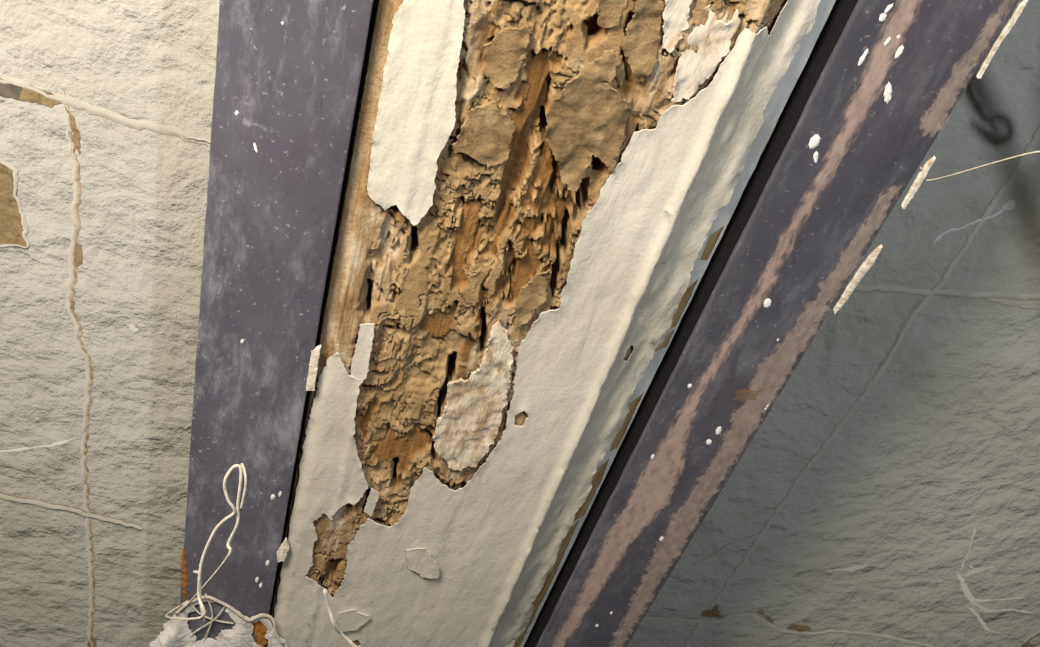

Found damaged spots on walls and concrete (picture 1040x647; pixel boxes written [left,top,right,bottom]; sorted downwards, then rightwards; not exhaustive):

peeling [453,24,530,169]
flaking render [0,160,30,249]
peeling [516,268,551,331]
crack [844,285,1040,330]
crack [0,77,210,647]
peeling [306,345,321,391]
peeling [277,537,290,562]
peeling [513,394,642,647]
crack [644,612,943,647]